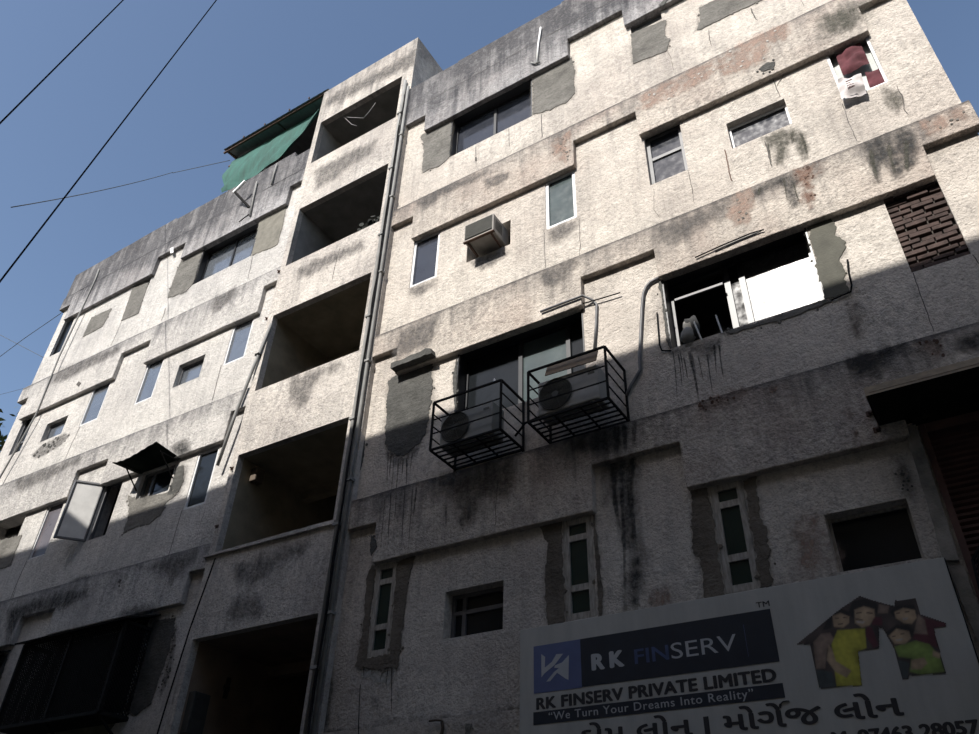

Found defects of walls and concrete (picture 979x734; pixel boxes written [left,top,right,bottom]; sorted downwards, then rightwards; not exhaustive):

damp [673,340,723,391]
damp [576,426,641,604]